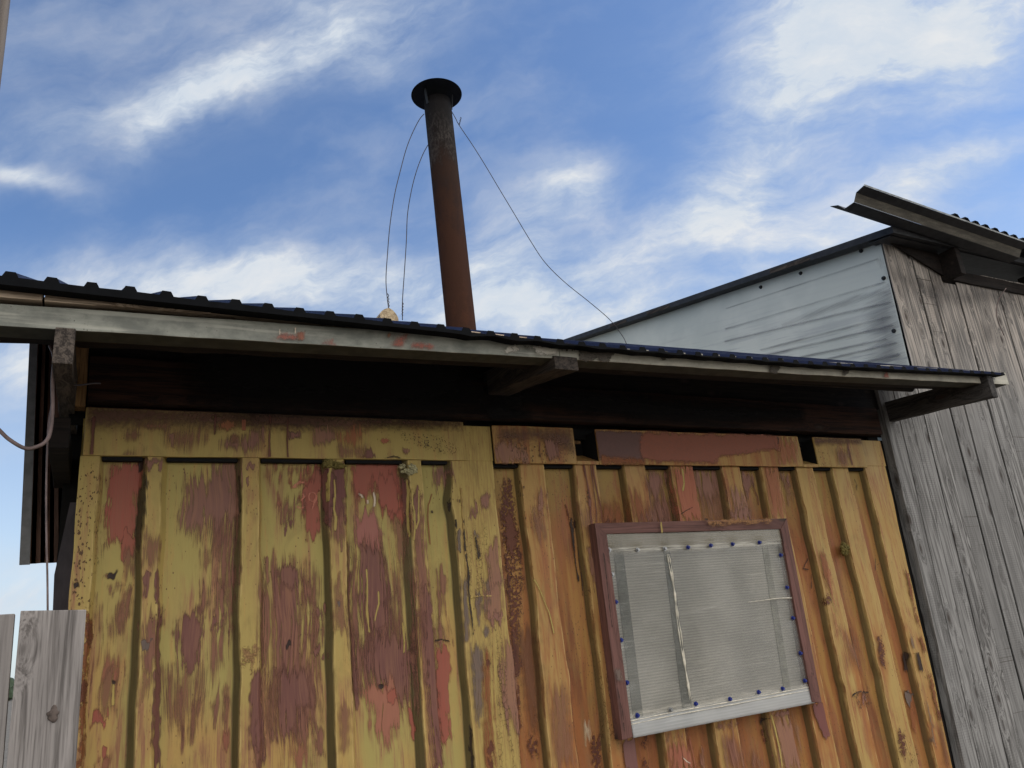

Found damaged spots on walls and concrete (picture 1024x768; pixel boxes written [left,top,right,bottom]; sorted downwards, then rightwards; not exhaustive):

peeling [73,419,266,768]
peeling [238,424,507,768]
peeling [497,639,520,736]
rust [499,478,539,758]
peeling [495,429,574,464]
peeling [596,430,798,533]